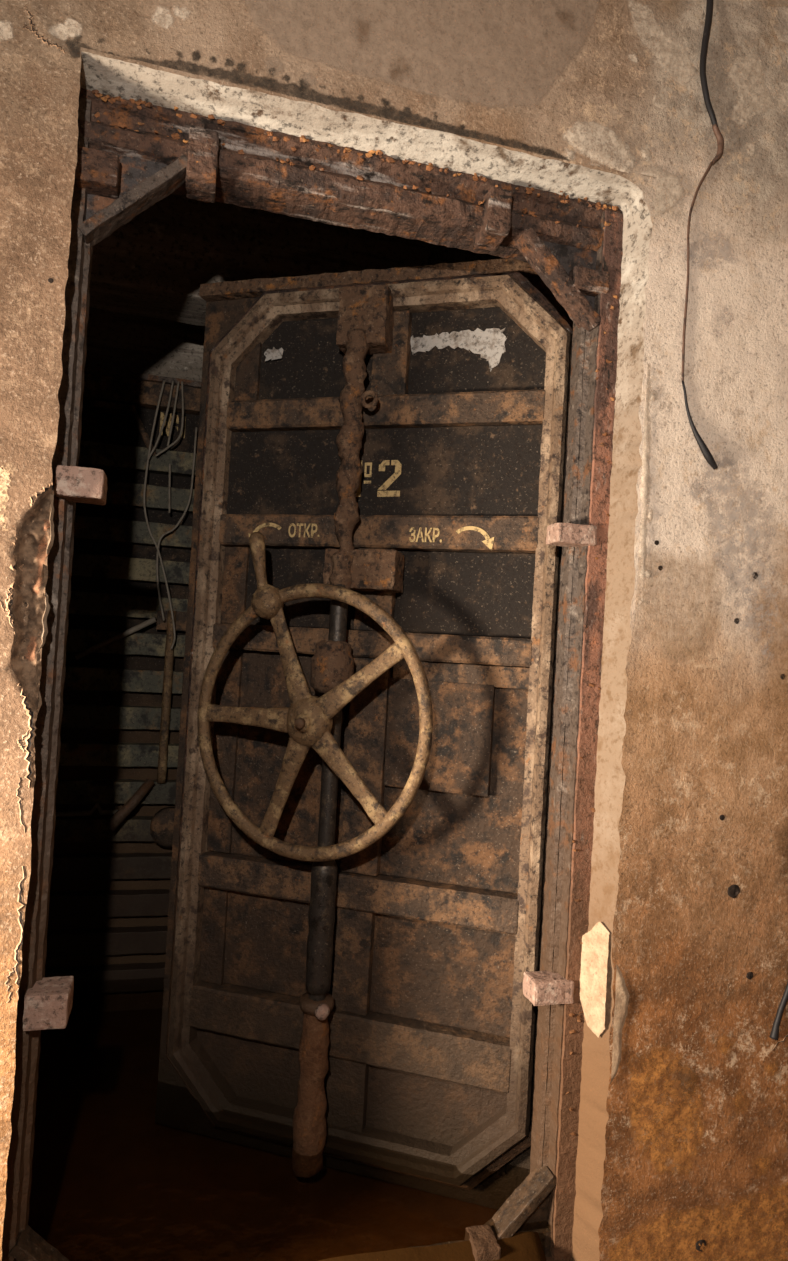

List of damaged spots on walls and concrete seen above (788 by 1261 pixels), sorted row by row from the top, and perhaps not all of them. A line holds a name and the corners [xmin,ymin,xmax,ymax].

spalling [0,482,54,712]